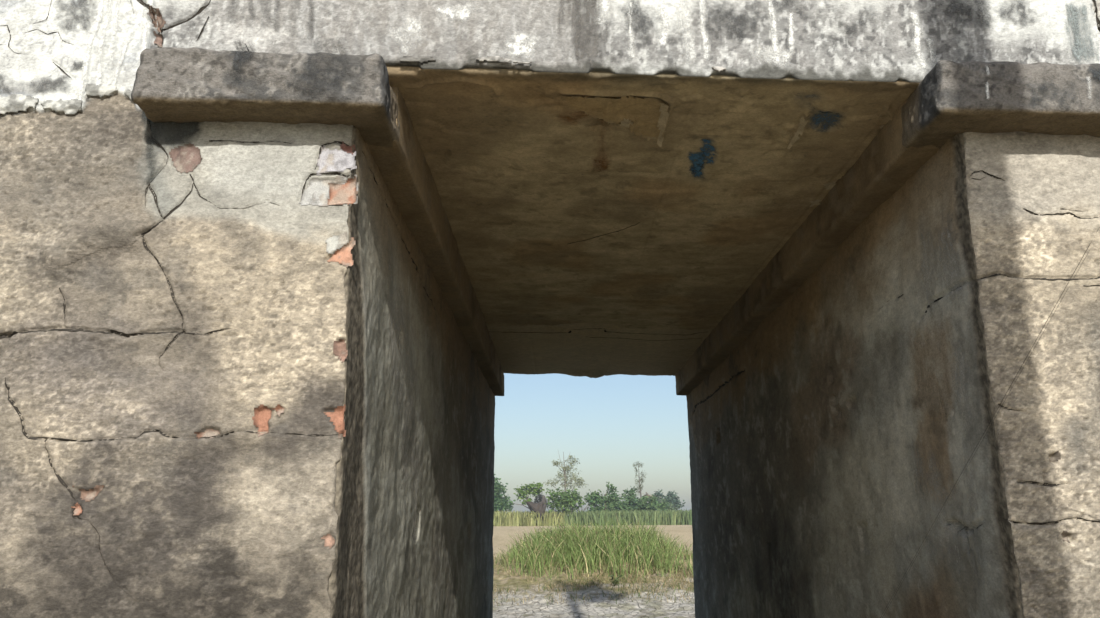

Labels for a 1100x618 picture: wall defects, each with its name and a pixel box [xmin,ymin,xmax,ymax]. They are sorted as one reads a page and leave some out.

crack [130,0,211,48]
efflorescence [658,0,709,59]
efflorescence [757,0,793,64]
efflorescence [911,12,936,68]
leakage [1067,4,1100,80]
crack [1092,0,1100,32]
spalling [169,143,202,173]
flaking render [299,141,359,206]
flaking render [325,232,356,267]
flaking render [324,404,346,439]
crack [880,208,1100,618]
crack [5,377,338,594]